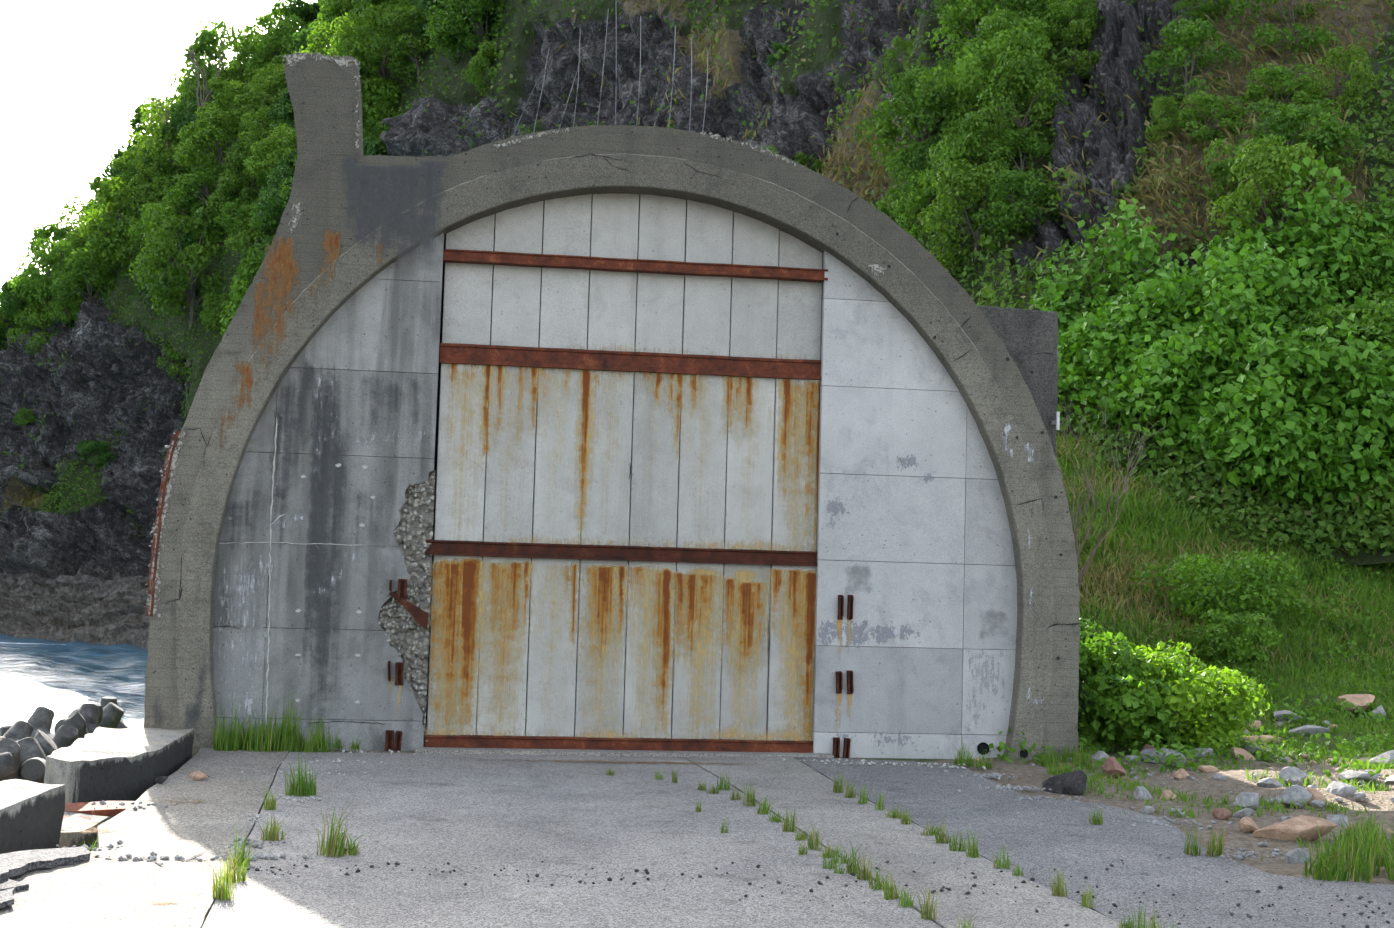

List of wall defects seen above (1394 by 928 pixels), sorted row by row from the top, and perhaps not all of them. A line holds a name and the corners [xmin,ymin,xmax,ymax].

leakage [186,503,273,727]
corrosion [221,238,312,437]
leakage [273,363,417,691]
spalling [376,470,435,742]
corrosion [448,363,621,543]
corrosion [429,558,816,741]
corrosion [645,372,704,442]
corrosion [724,376,757,428]
corrosion [736,379,820,550]